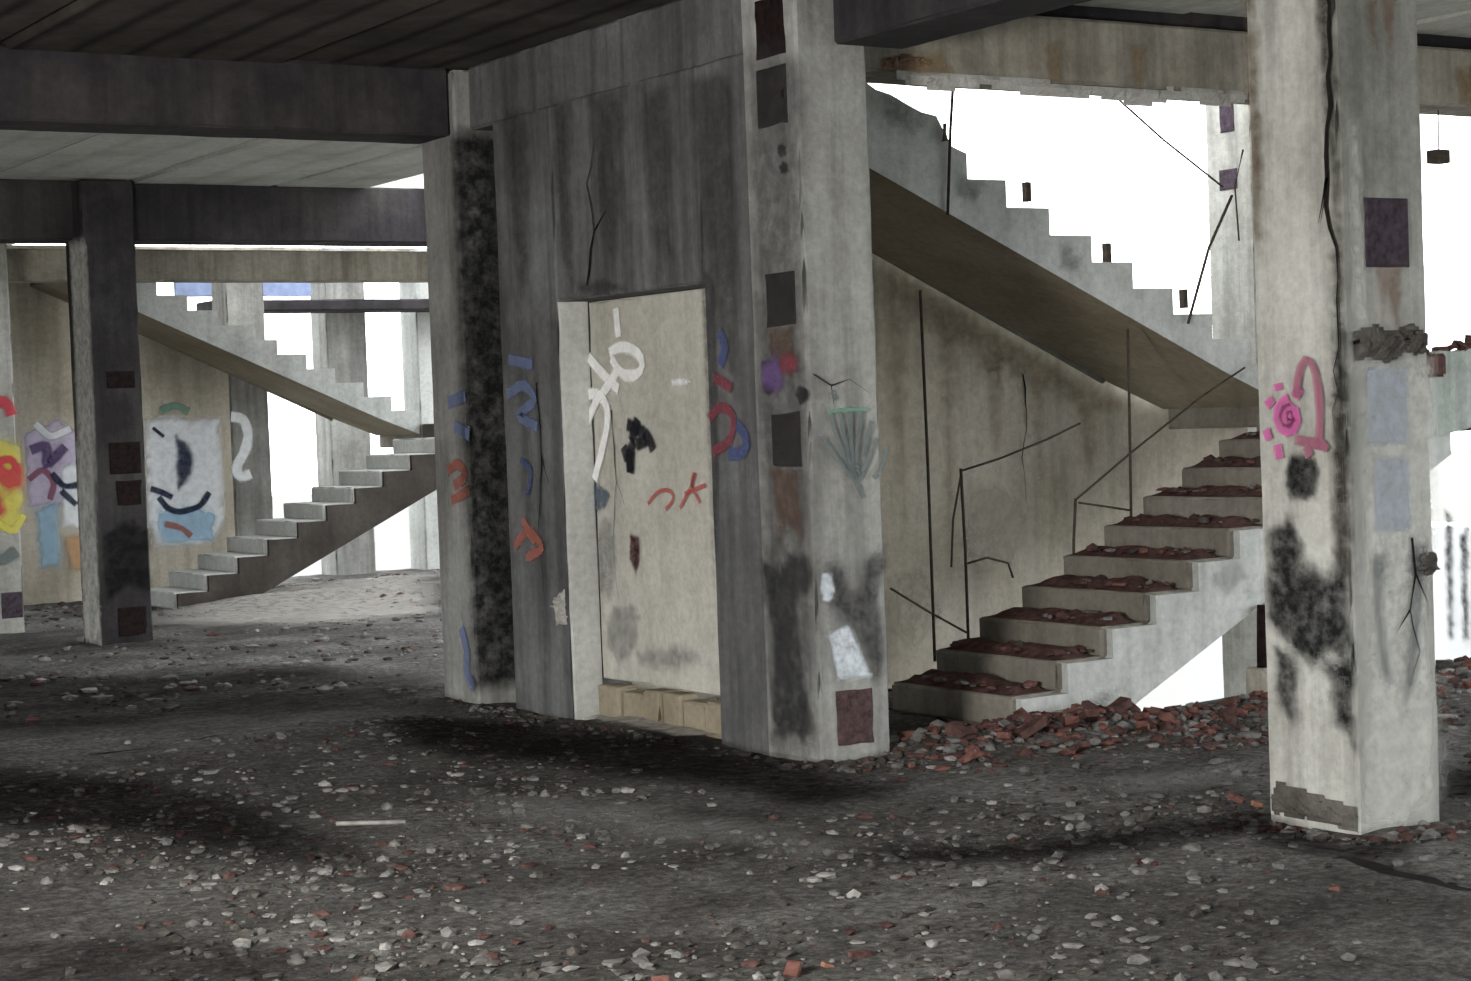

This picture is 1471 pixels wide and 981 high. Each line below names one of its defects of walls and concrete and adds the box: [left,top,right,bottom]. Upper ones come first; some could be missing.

crack [1318,0,1426,432]
peeling [1354,323,1440,816]